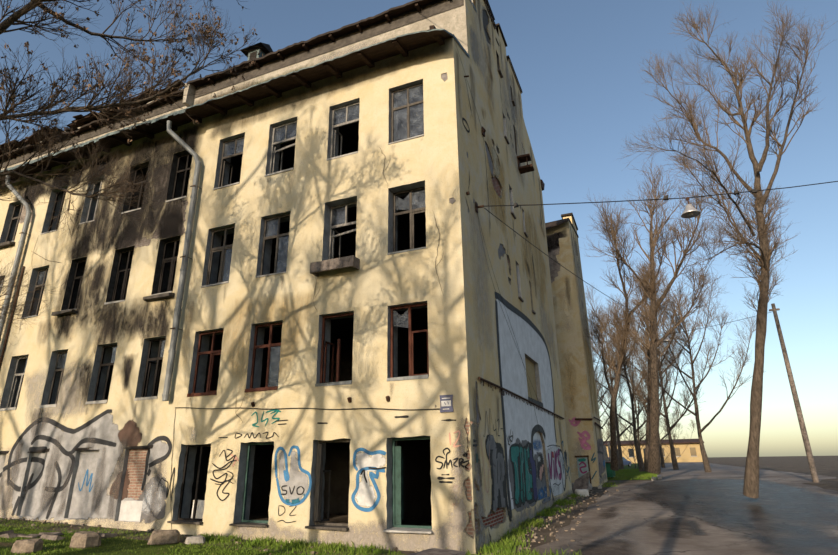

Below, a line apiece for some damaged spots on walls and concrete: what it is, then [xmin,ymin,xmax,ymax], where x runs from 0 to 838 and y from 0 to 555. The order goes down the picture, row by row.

flaking render [485,138,503,198]
crack [433,212,444,293]
flaking render [546,232,568,283]
flaking render [0,456,36,521]
flaking render [106,460,158,529]
flaking render [315,381,572,553]
flaking render [237,519,304,540]